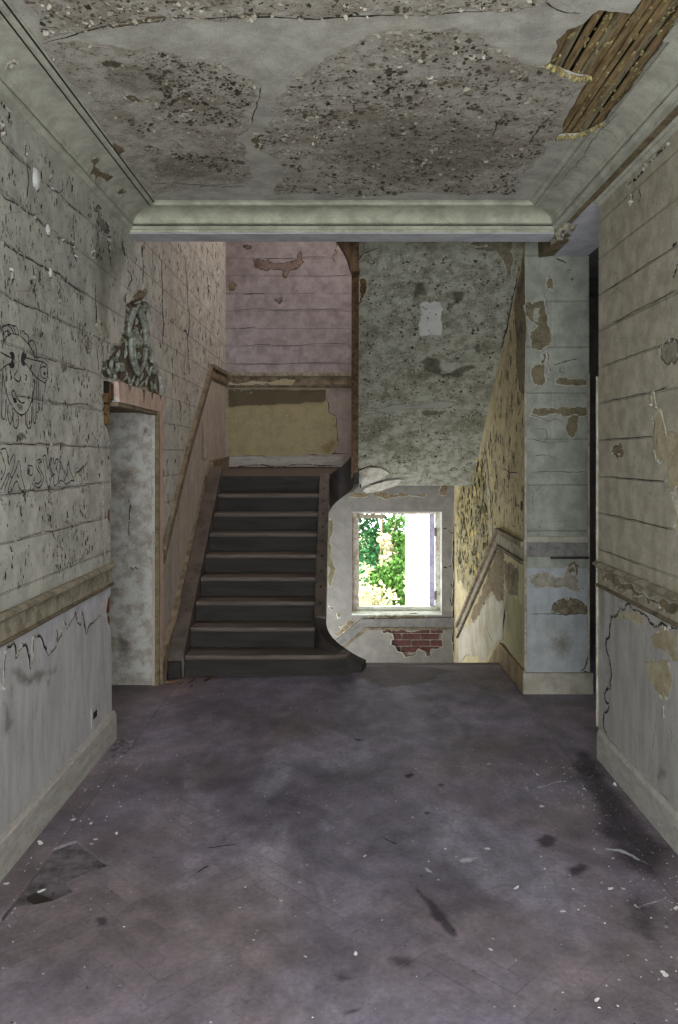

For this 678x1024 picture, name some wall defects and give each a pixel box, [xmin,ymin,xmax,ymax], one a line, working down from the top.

peeling [24,0,678,198]
peeling [243,245,304,278]
peeling [226,378,340,457]
peeling [349,242,588,664]
peeling [658,337,678,366]
peeling [0,598,112,832]
peeling [601,572,678,810]